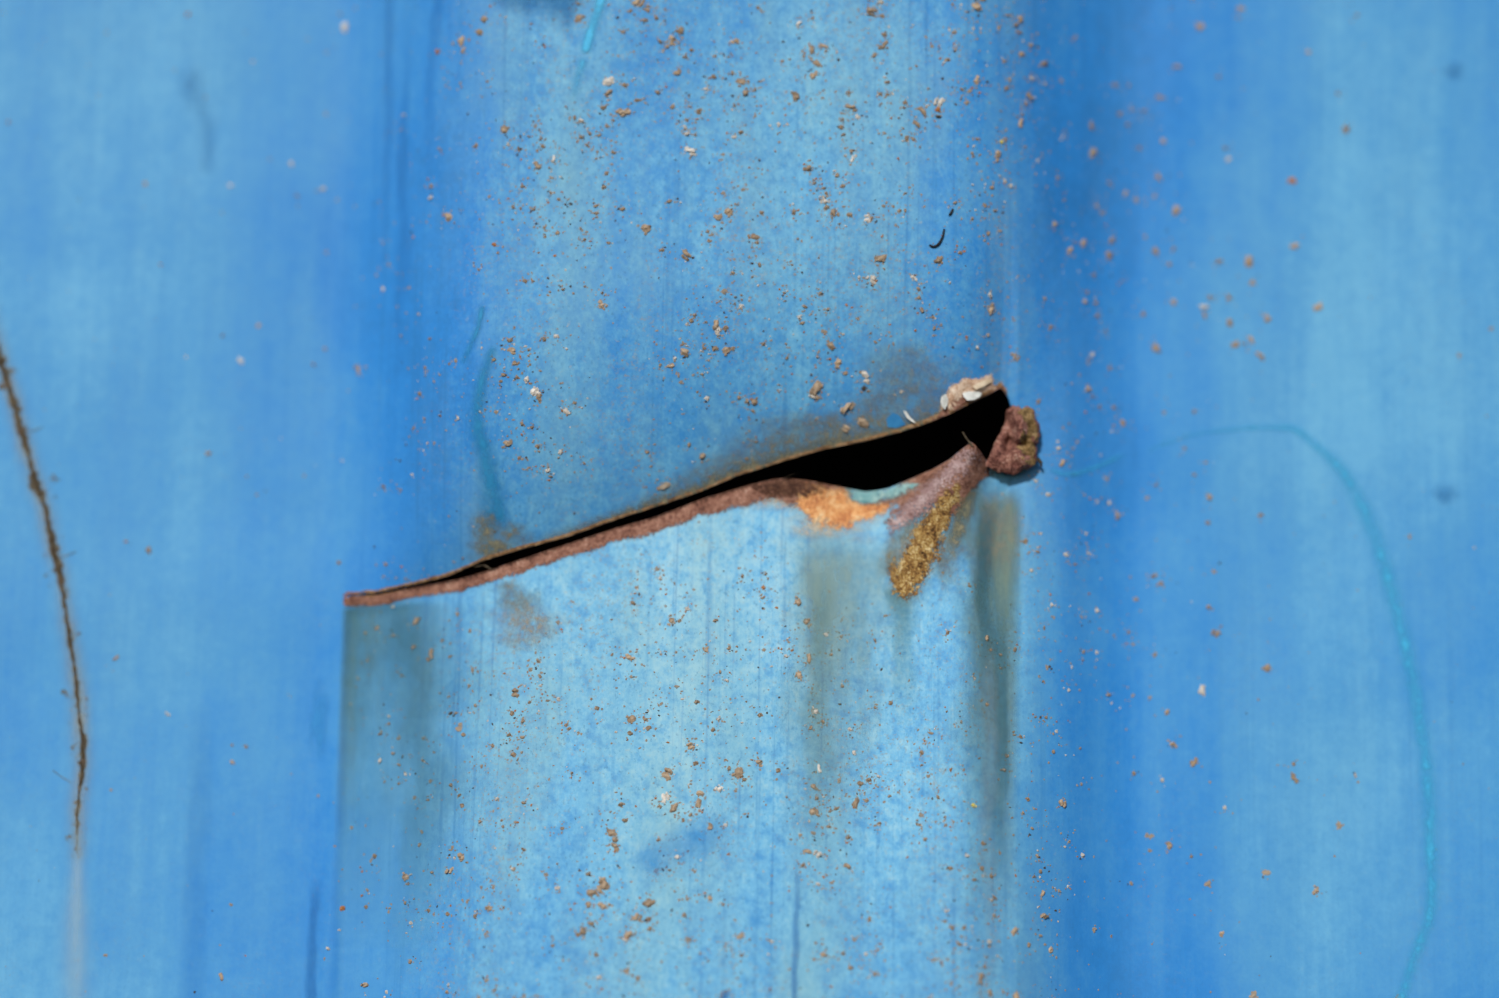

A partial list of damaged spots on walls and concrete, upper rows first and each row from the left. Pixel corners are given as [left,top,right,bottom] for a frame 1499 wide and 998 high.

rust [931,395,968,421]
rust [343,442,989,640]
rust [947,492,1018,732]